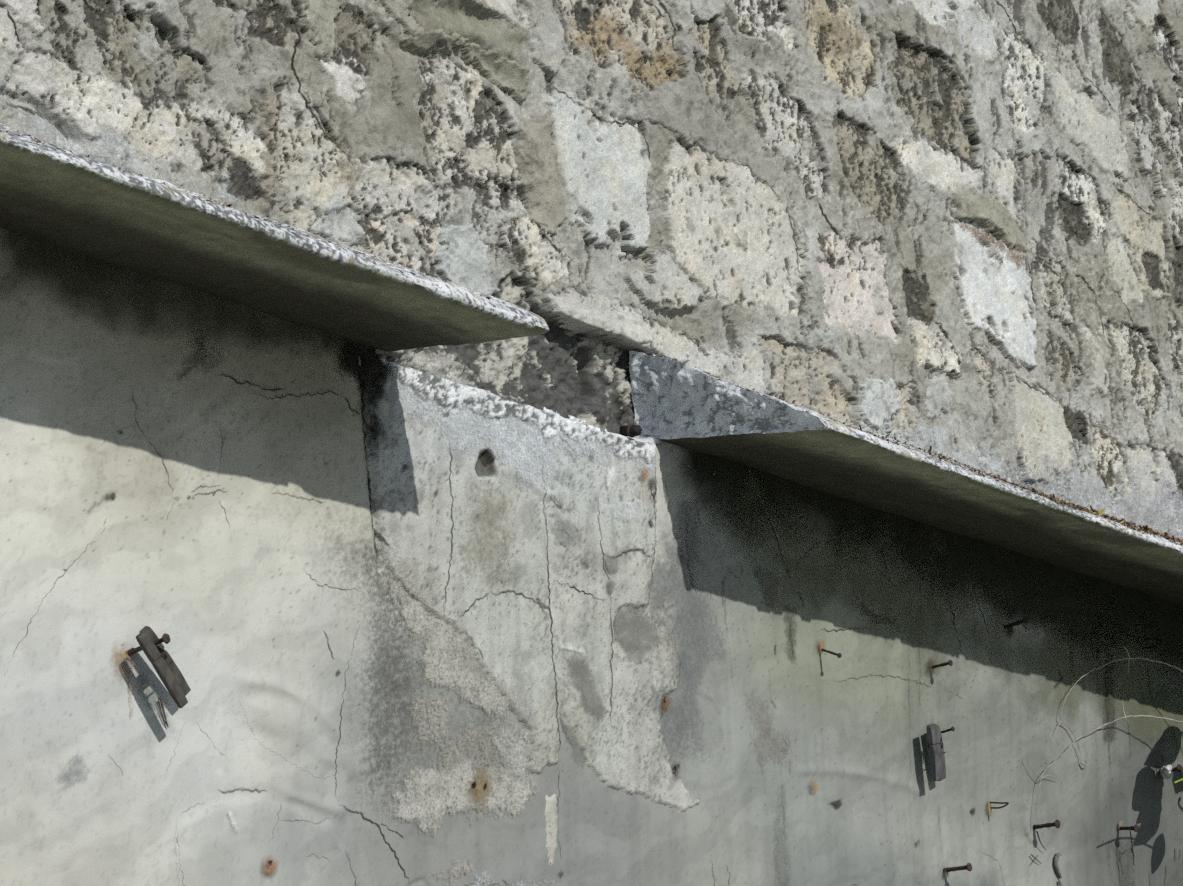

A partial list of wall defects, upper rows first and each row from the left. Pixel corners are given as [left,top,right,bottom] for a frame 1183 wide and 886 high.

crack [220,373,389,563]
corrosion [264,858,278,875]
crack [189,631,409,878]
corrosion [469,773,489,802]
crack [403,438,658,857]
peeling [365,364,700,876]
damp [613,449,1183,763]